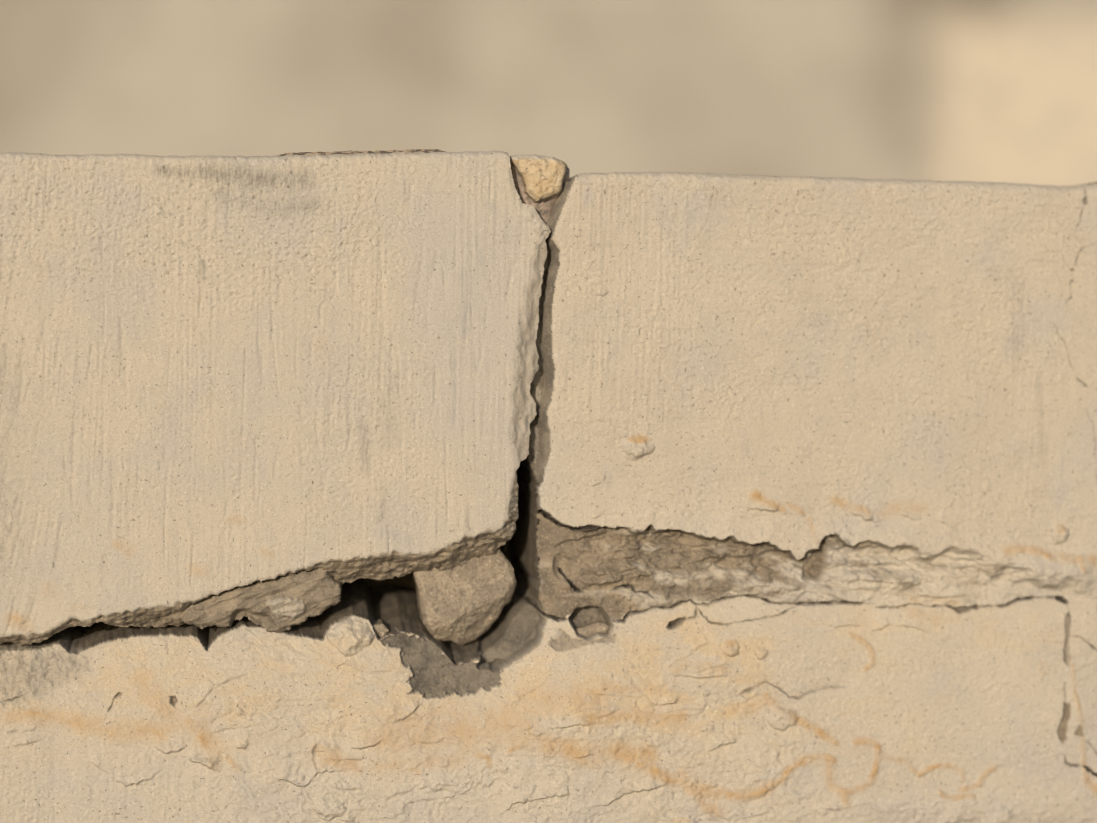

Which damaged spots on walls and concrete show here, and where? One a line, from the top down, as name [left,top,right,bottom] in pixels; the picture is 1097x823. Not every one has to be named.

crack [539,251,548,317]
crack [1049,185,1097,481]
crack [499,364,1097,721]
crack [0,572,480,664]
spalling [382,510,1079,700]
crack [0,693,28,704]
crack [107,692,125,714]
crack [195,673,250,710]
peeling [1057,703,1086,745]
crack [313,737,323,776]
crack [1063,738,1097,778]